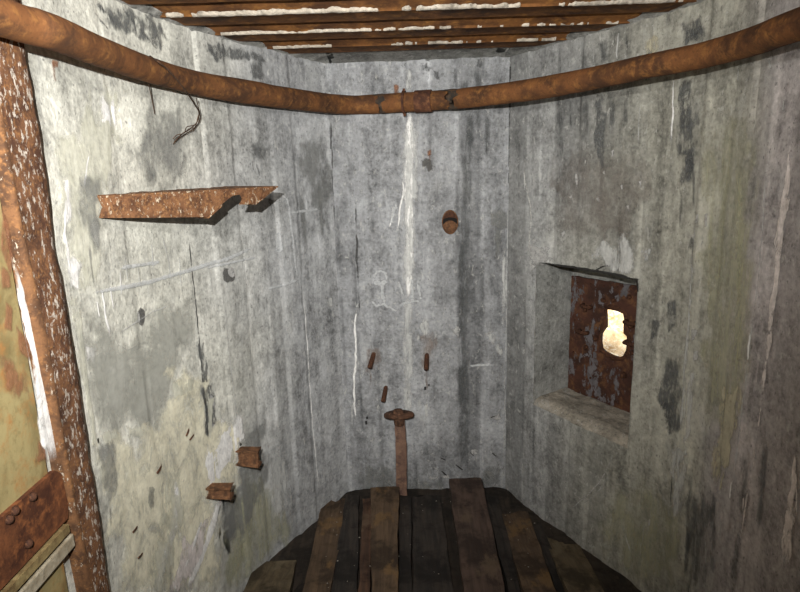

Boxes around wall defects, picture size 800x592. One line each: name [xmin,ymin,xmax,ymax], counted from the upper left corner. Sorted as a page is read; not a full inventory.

water stain [677,81,698,202]
crack [189,244,216,446]
water stain [651,301,676,339]
water stain [657,362,681,433]